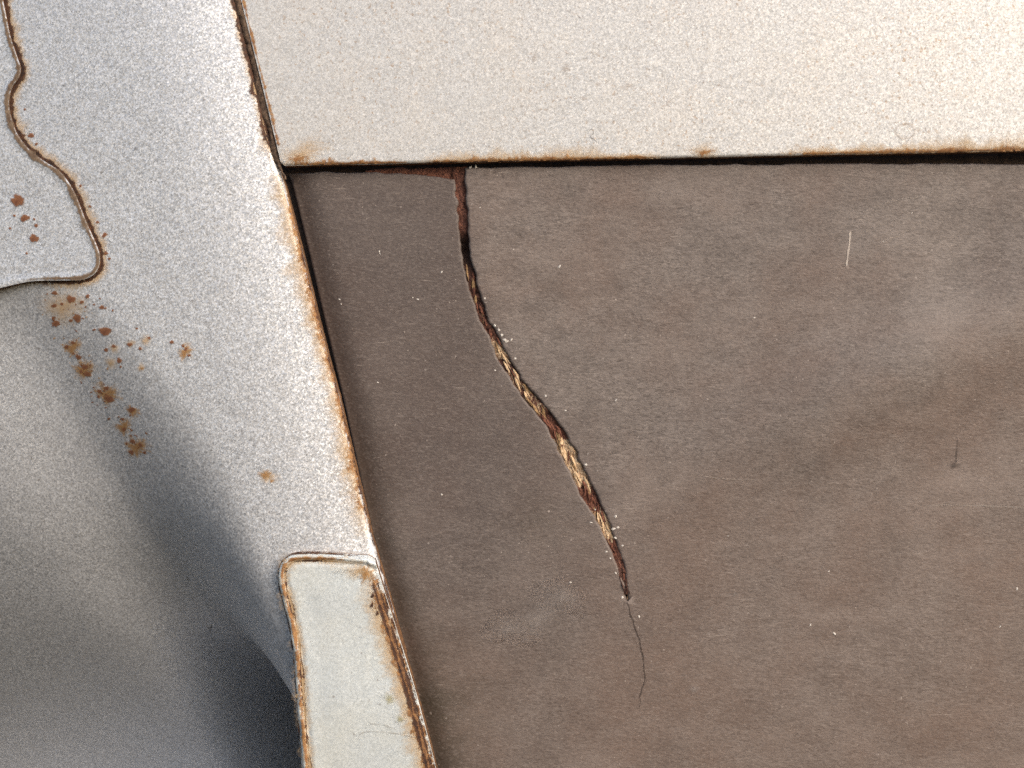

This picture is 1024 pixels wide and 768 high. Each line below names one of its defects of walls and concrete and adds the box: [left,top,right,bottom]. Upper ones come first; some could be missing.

rust [0,0,151,456]
rust [289,151,406,165]
rust [277,188,436,768]
crack [365,165,646,708]
rust [426,151,658,163]
rust [785,141,1024,156]